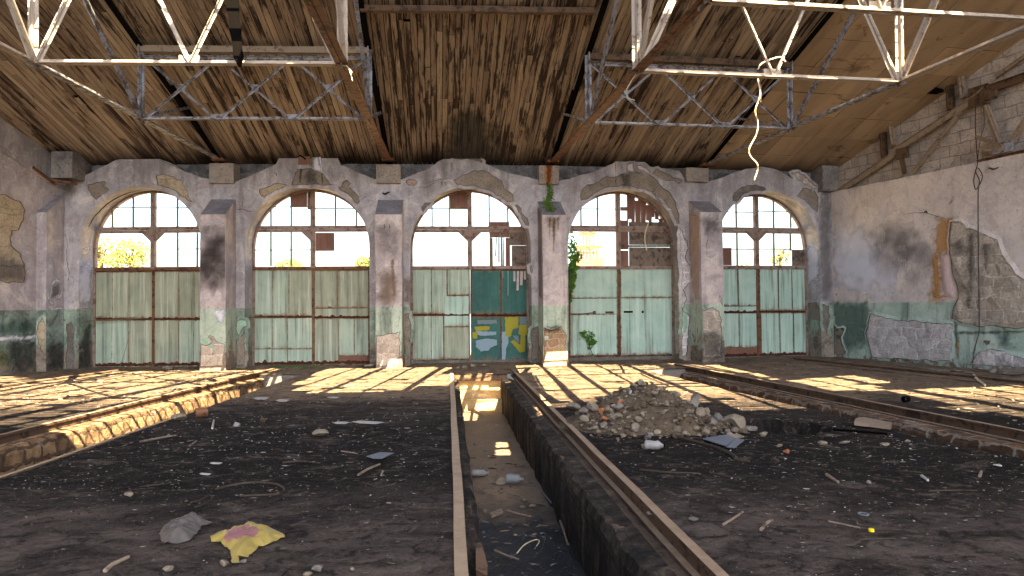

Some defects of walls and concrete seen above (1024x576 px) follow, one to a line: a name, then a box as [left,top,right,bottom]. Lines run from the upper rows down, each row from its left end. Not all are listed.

flaking render [85,178,113,203]
flaking render [153,171,194,205]
flaking render [256,155,363,208]
flaking render [450,157,532,229]
flaking render [0,191,28,287]
peeling [527,323,567,365]
spalling [577,161,1024,459]
water stain [807,194,897,347]
corrosion [932,218,953,300]
spalling [0,315,302,476]